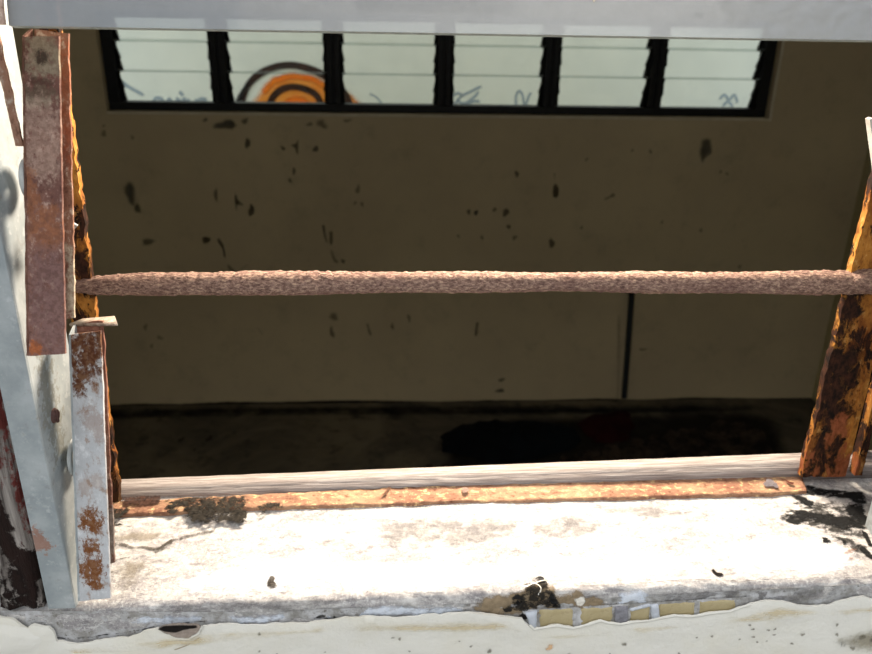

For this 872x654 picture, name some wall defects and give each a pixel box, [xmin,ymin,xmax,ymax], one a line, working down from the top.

crack [111,530,213,573]
damp [727,485,872,575]
peeling [474,576,752,631]
spalling [159,623,203,641]